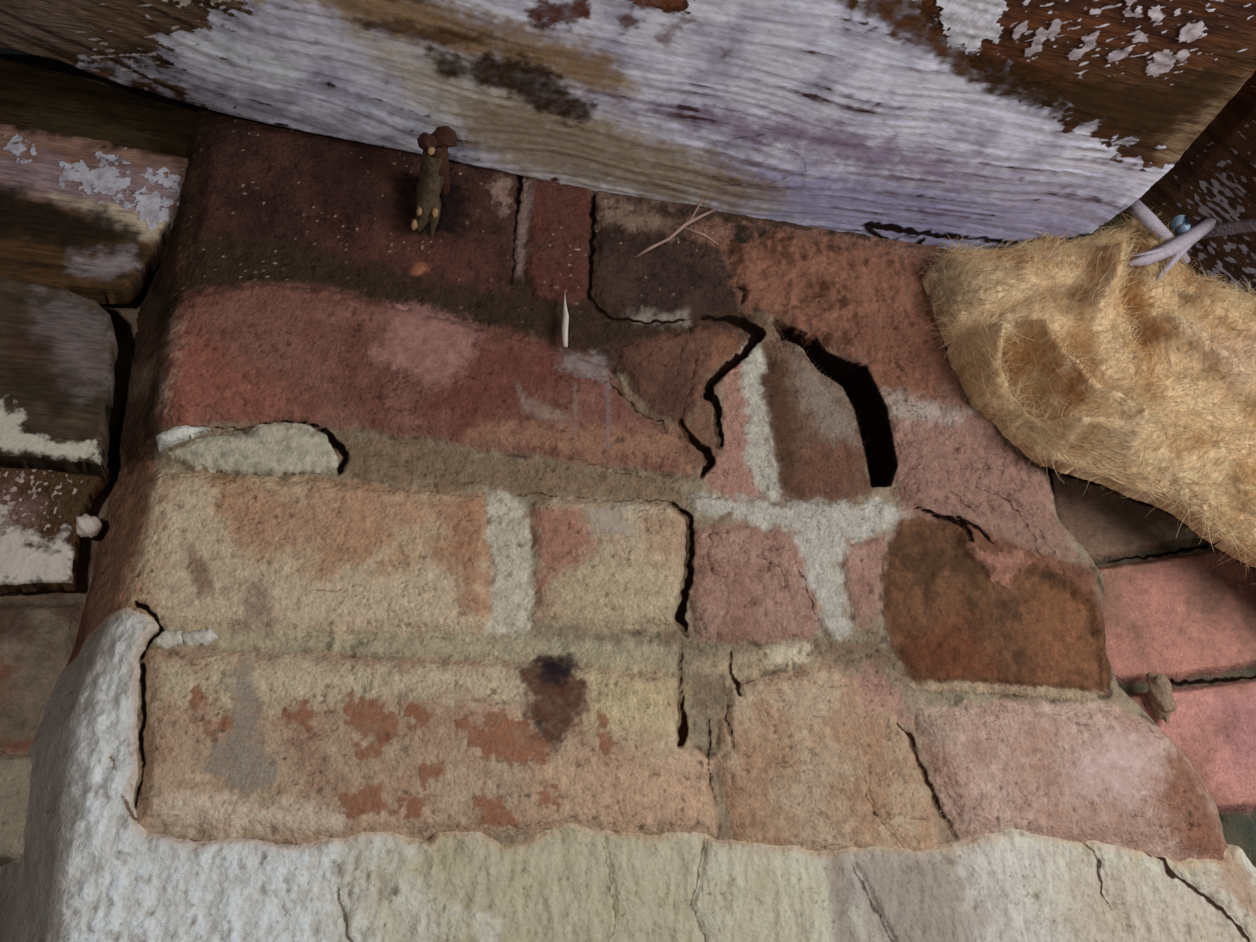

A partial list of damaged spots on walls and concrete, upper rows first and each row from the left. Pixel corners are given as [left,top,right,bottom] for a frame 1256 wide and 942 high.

peeling [525,0,591,30]
peeling [936,0,1062,59]
peeling [1069,31,1100,60]
peeling [1106,0,1204,77]
peeling [58,147,184,231]
corrosion [395,173,463,233]
crack [587,195,766,477]
crack [532,464,742,798]
crack [123,600,164,821]
leakage [541,661,574,684]
crack [1086,844,1112,910]
crack [1136,849,1250,942]